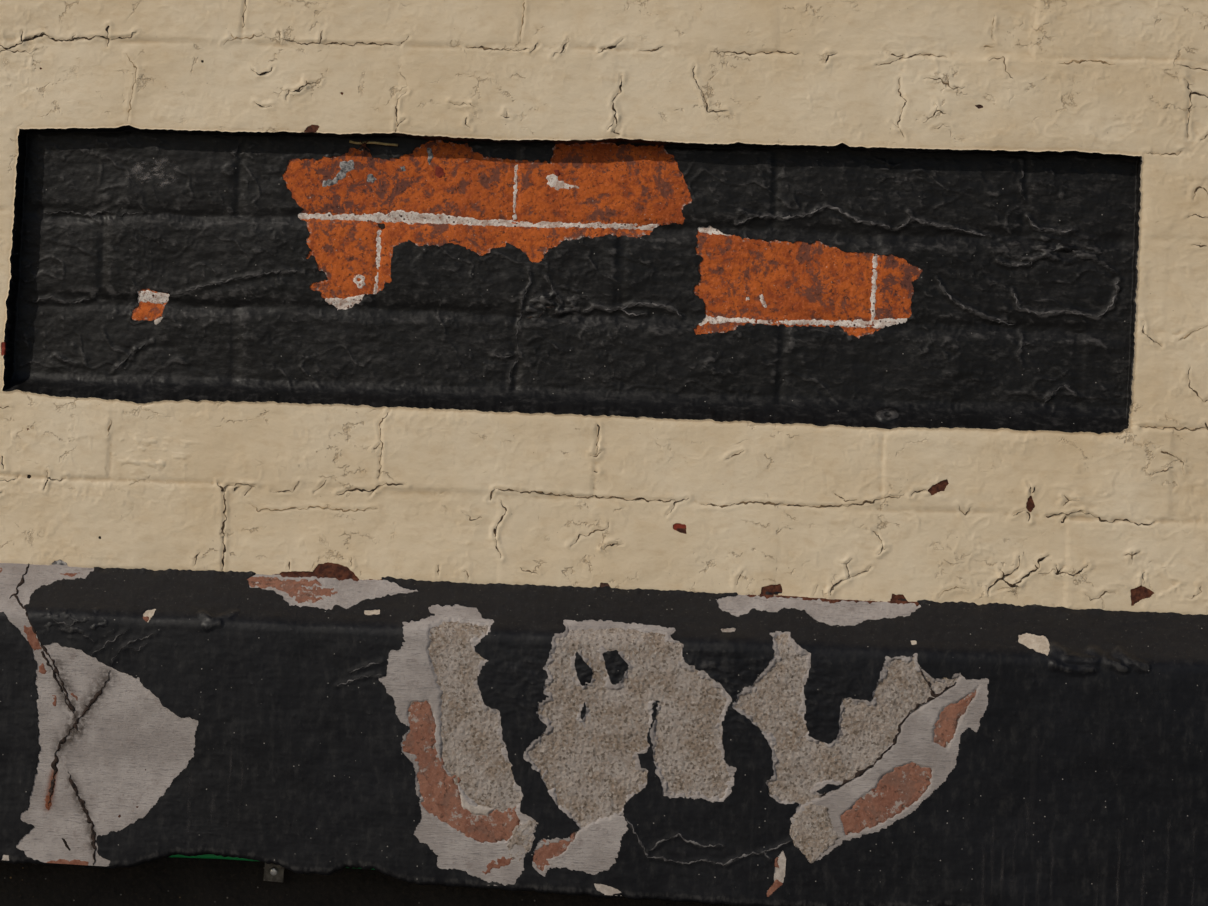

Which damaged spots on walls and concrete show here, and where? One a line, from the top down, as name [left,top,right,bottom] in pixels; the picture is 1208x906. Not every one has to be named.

crack [224,0,409,46]
crack [0,26,137,121]
peeling [282,140,923,338]
crack [195,413,402,569]
peeling [247,562,418,615]
crack [463,425,927,573]
peeling [716,584,921,632]
crack [943,555,1109,601]
peeling [1018,633,1050,656]
crack [1016,484,1152,580]
peeling [0,560,198,866]
peeling [378,604,989,897]